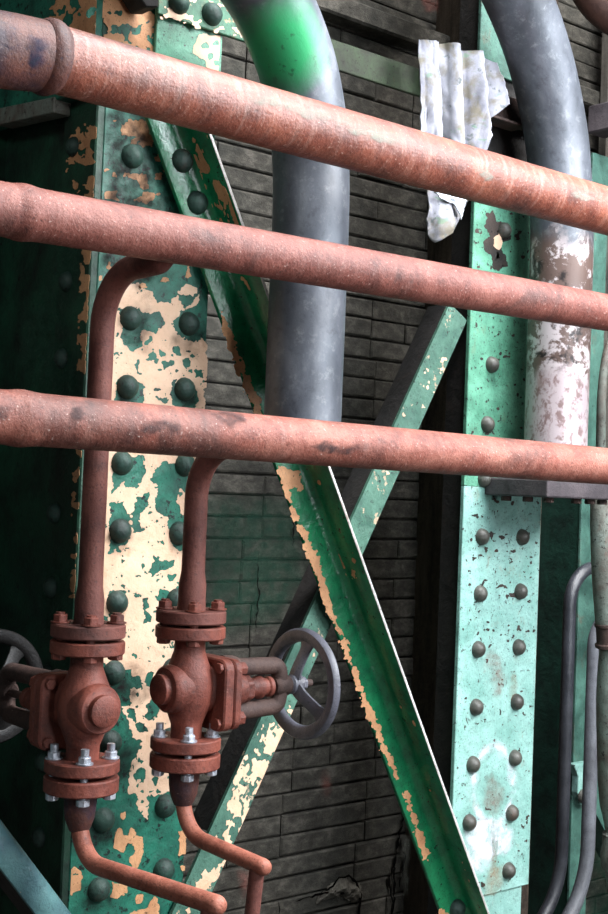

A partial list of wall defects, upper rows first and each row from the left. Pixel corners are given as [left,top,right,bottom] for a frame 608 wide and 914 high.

peeling [49,0,242,71]
peeling [111,266,208,409]
peeling [103,451,182,820]
peeling [276,465,399,780]
peeling [215,722,284,843]
peeling [70,867,83,895]
peeling [113,812,144,868]
peeling [110,882,160,914]
peeling [178,831,186,871]
peeling [196,860,226,890]
peeling [402,790,431,861]
water stain [468,808,510,869]